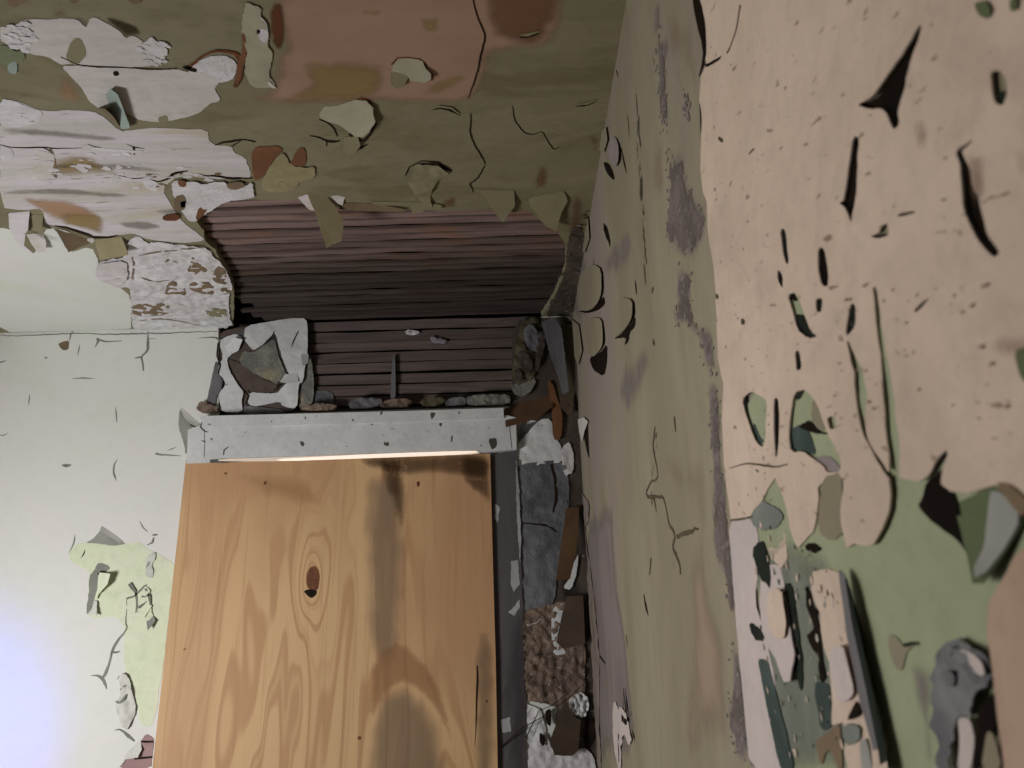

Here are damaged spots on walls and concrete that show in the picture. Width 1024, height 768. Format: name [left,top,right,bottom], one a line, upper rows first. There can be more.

peeling [0,2,453,353]
crack [468,0,486,193]
crack [512,107,559,150]
peeling [599,127,619,180]
peeling [654,10,667,135]
spalling [280,189,635,476]
peeling [665,0,1024,768]
peeling [87,563,110,617]
peeling [87,526,125,546]
peeling [126,534,156,630]
peeling [526,493,633,768]
crack [646,427,698,575]